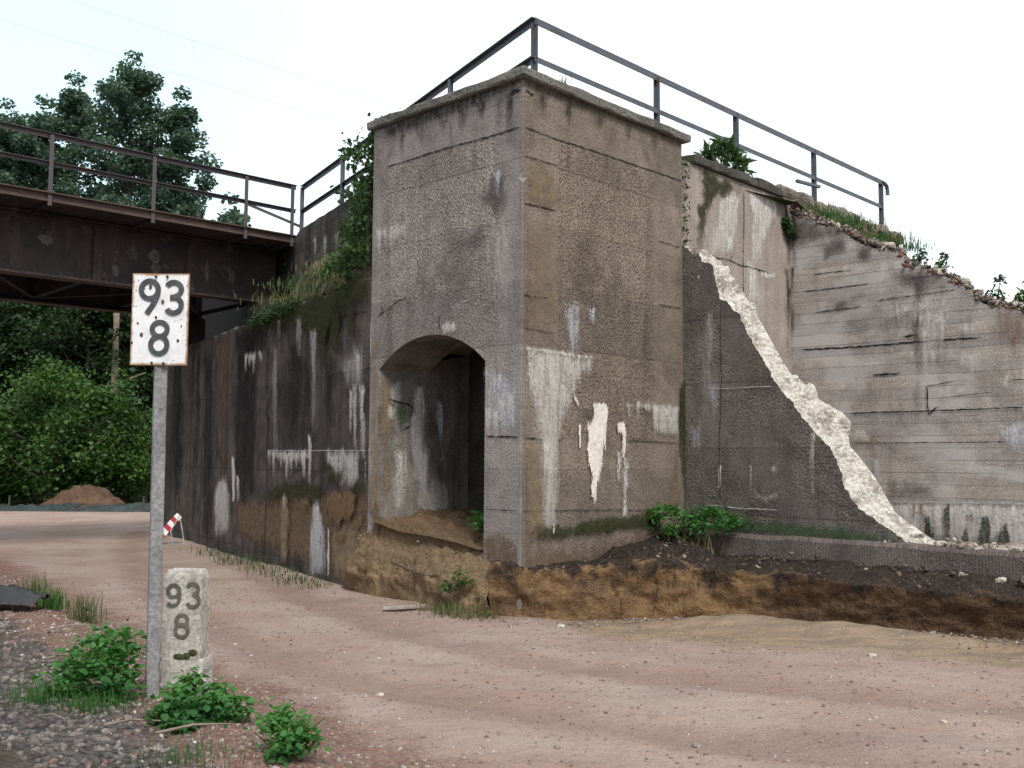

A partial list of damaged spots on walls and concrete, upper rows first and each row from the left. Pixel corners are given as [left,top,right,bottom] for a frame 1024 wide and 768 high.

damp [697,203,707,232]
crack [803,270,977,350]
damp [173,366,182,486]
damp [196,327,267,538]
damp [268,307,340,468]
damp [327,450,366,494]
efflorescence [350,384,365,434]
damp [394,386,443,507]
spalling [684,188,935,545]
crack [851,379,1024,415]
efflorescence [310,505,329,574]
damp [893,486,1024,543]